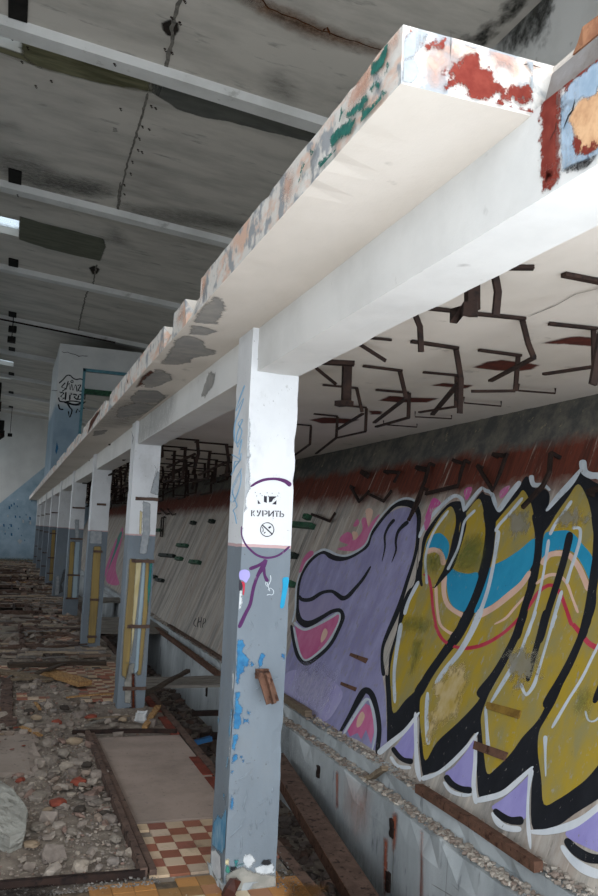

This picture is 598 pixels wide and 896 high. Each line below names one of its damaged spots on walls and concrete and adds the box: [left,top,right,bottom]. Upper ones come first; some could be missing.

crack [117,93,148,210]
crack [164,0,182,67]
crack [262,0,381,50]
peeling [284,44,389,191]
peeling [403,26,533,113]
leakage [468,0,551,49]
peeling [560,59,598,173]
crack [63,265,98,357]
peeling [117,297,226,417]
peeling [218,640,265,773]
peeling [211,794,276,891]
corrosion [384,815,397,892]